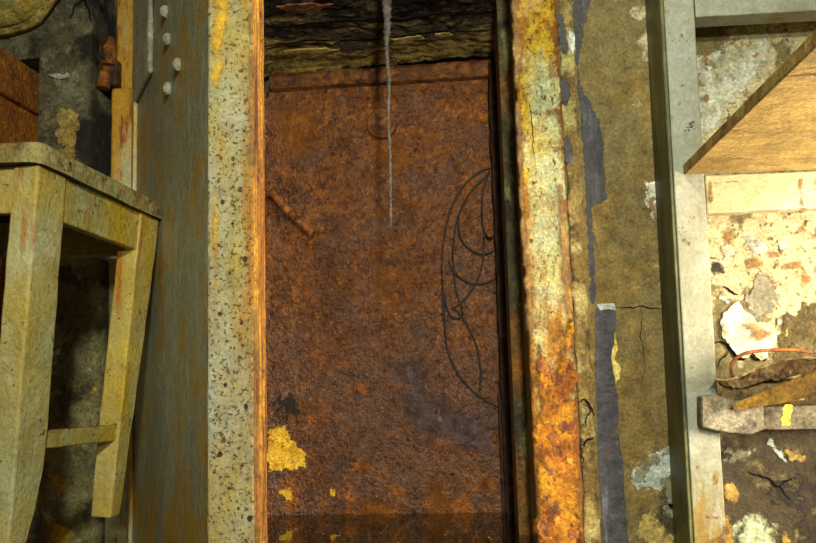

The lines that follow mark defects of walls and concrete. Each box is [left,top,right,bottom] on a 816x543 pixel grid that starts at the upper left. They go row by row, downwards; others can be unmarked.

crack [69,0,92,22]
rust [511,0,522,84]
peeling [557,0,674,543]
flaking render [744,235,768,258]
rust [515,101,584,543]
crack [618,306,662,379]
peeling [719,274,816,363]
crack [750,472,793,500]